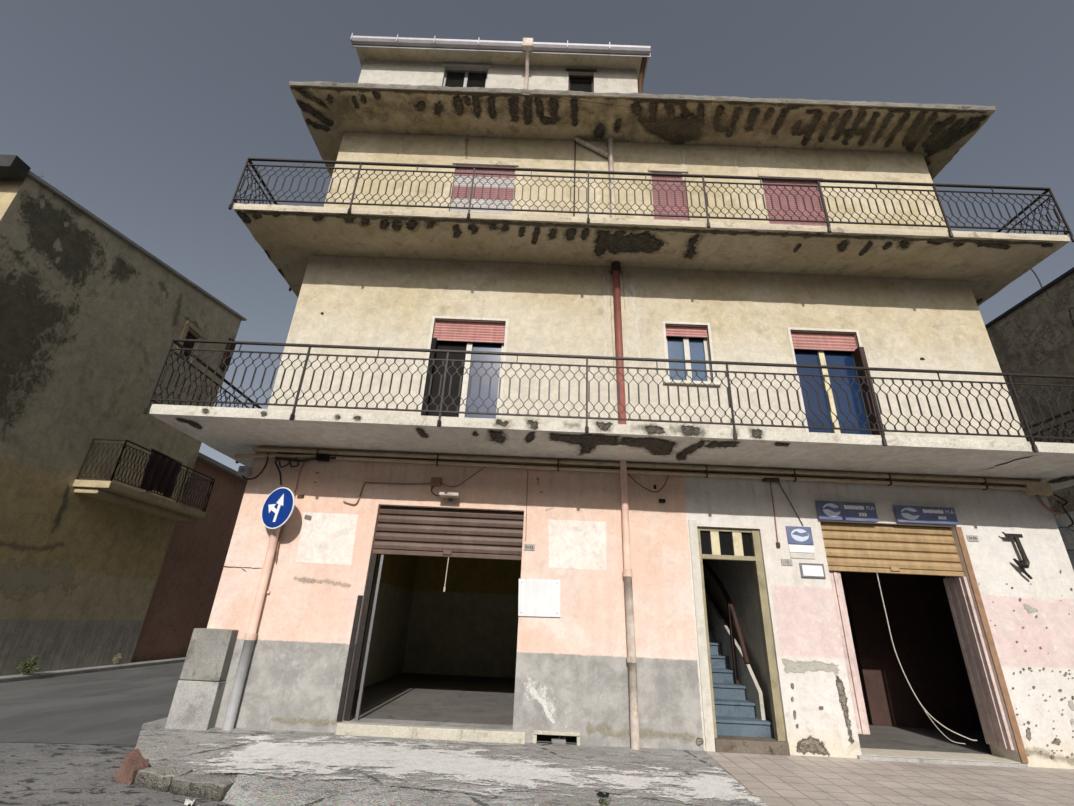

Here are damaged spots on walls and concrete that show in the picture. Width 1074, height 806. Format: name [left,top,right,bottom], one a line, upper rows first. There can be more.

spalling [291,87,987,175]
peeling [237,211,1053,259]
water stain [0,191,139,431]
spalling [473,419,509,443]
spalling [524,419,538,443]
spalling [549,421,740,460]
water stain [524,676,567,728]
peeling [782,658,854,756]
spalling [1012,667,1074,759]